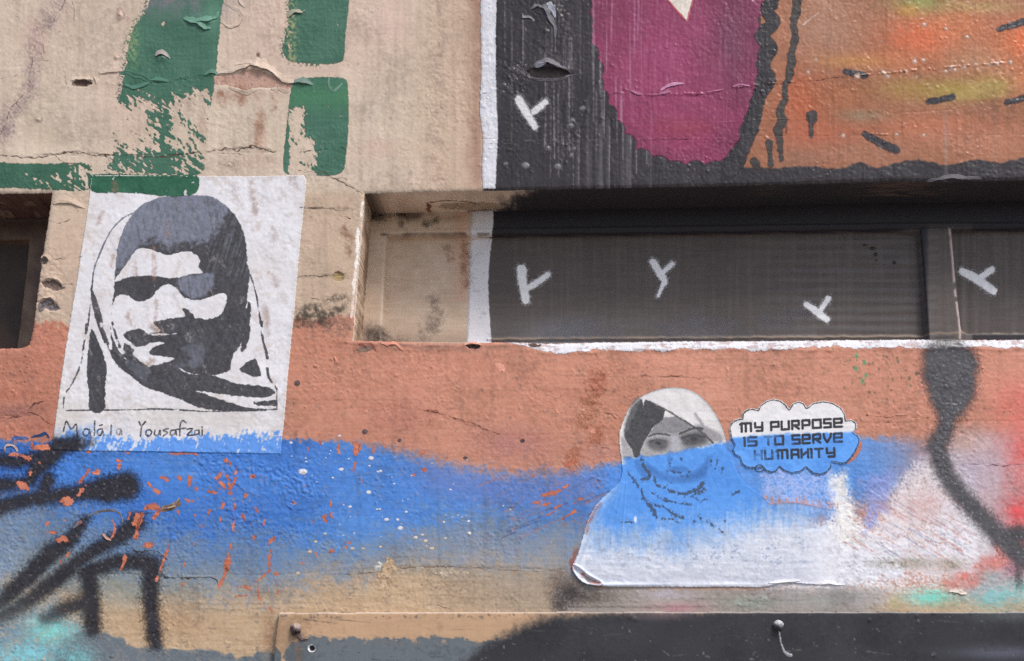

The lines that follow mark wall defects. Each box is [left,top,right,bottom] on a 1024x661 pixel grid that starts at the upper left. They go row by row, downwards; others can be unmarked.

peeling [182,0,245,30]
peeling [71,68,169,89]
peeling [181,57,313,95]
crack [2,145,274,164]
spalling [38,253,65,312]